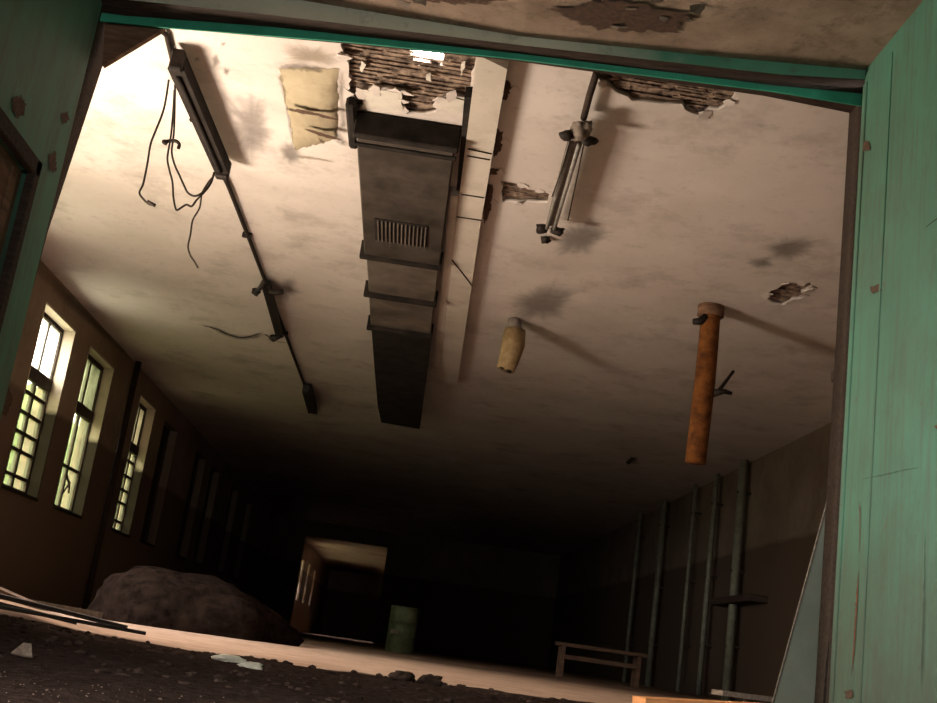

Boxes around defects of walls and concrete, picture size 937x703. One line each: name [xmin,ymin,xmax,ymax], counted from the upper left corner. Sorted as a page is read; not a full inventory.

spalling [335,43,476,114]
spalling [586,71,739,122]
peeling [493,128,511,157]
spalling [482,168,553,224]
spalling [760,281,817,305]